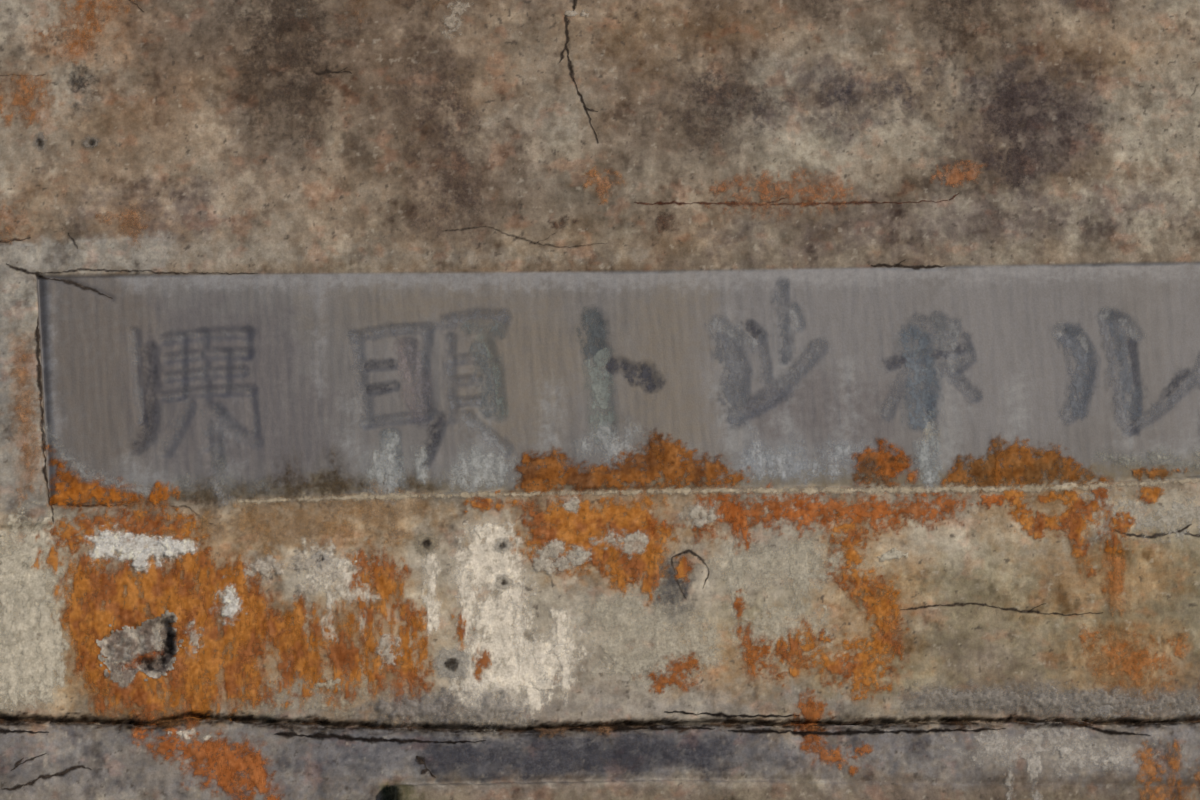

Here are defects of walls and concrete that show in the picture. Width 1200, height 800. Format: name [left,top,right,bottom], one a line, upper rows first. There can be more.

crack [560,0,598,142]
crack [35,317,127,524]
leakage [590,420,1200,541]
spalling [96,610,201,687]
rust [11,354,434,800]
peeling [243,549,342,598]
leakage [298,539,382,641]
peeling [377,634,401,665]
rust [452,615,466,647]
leakage [421,522,719,725]
rust [465,431,1188,775]
crack [0,711,1200,790]